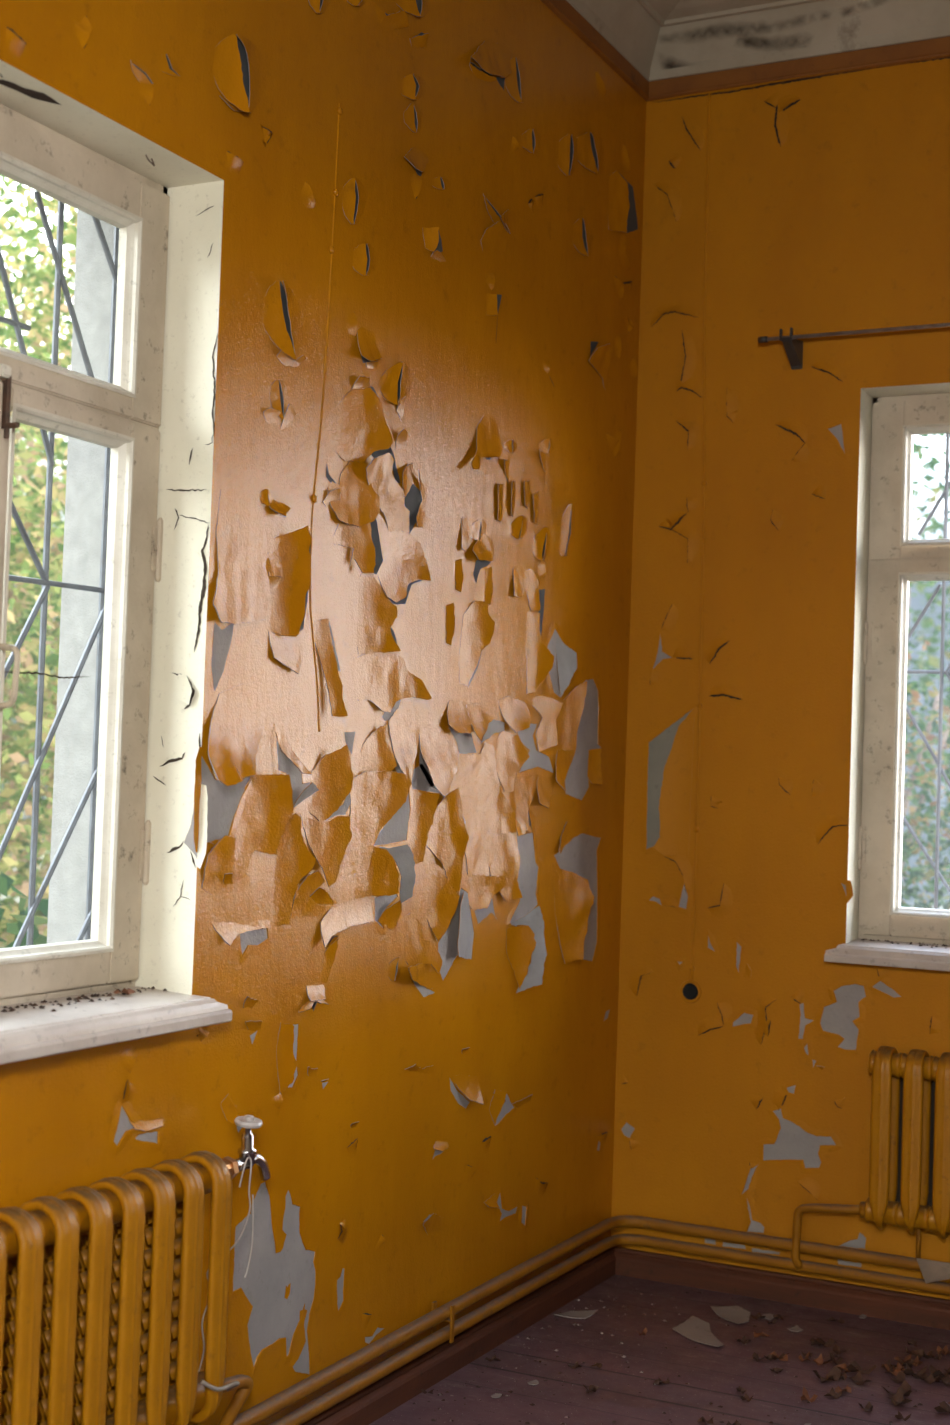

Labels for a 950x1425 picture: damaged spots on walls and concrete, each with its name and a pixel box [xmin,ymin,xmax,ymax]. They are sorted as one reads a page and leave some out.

peeling [263,281,307,430]
peeling [167,312,603,1109]
flaking render [791,968,908,1057]
flaking render [107,1080,164,1157]
peeling [405,1064,533,1133]
flaking render [700,1080,843,1257]
flaking render [228,1176,349,1382]